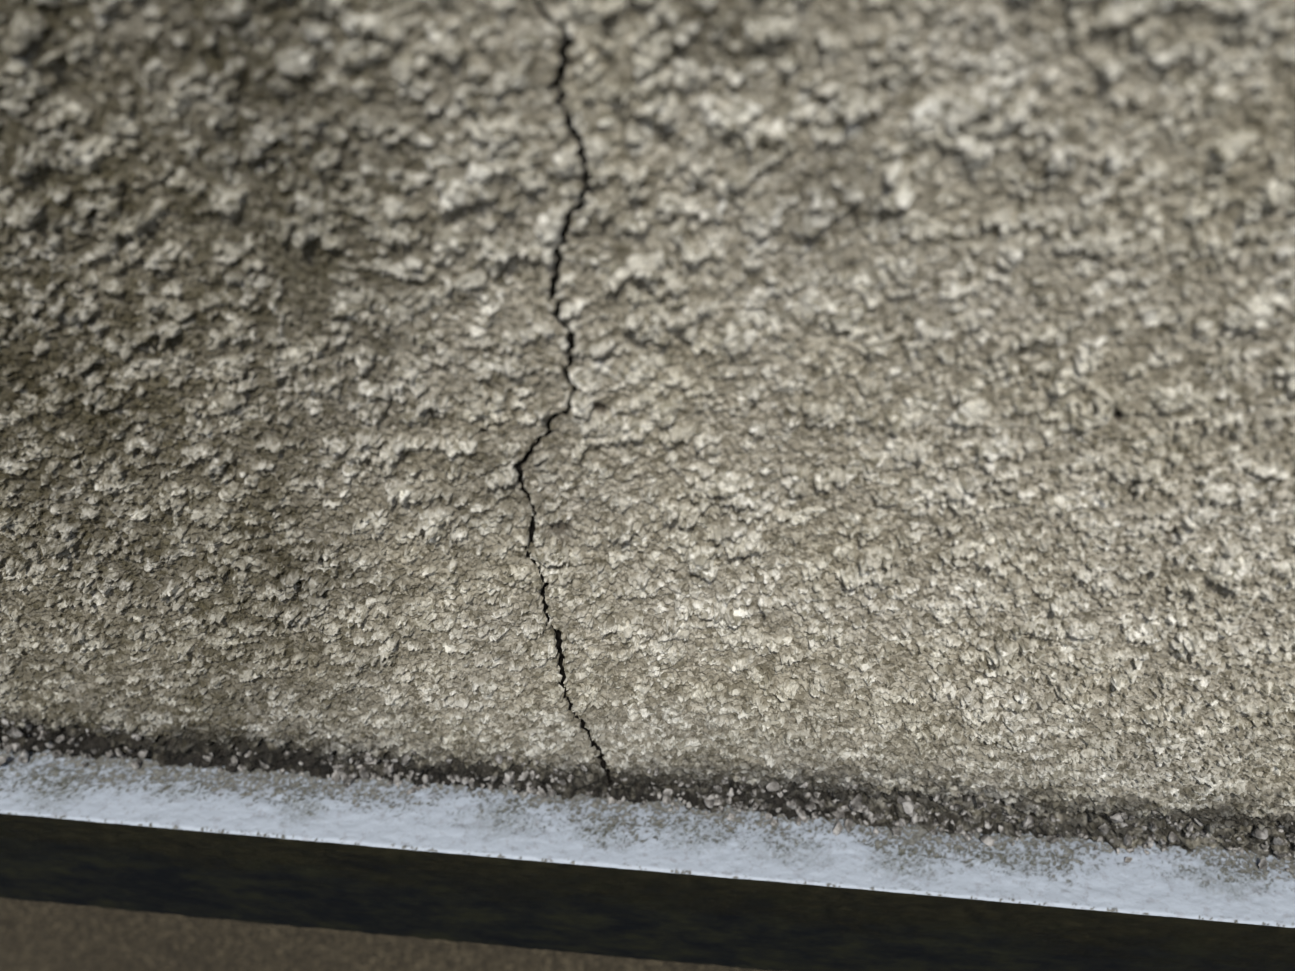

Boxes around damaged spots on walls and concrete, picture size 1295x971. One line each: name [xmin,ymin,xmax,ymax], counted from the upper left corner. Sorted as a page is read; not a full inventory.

crack [514,0,612,784]